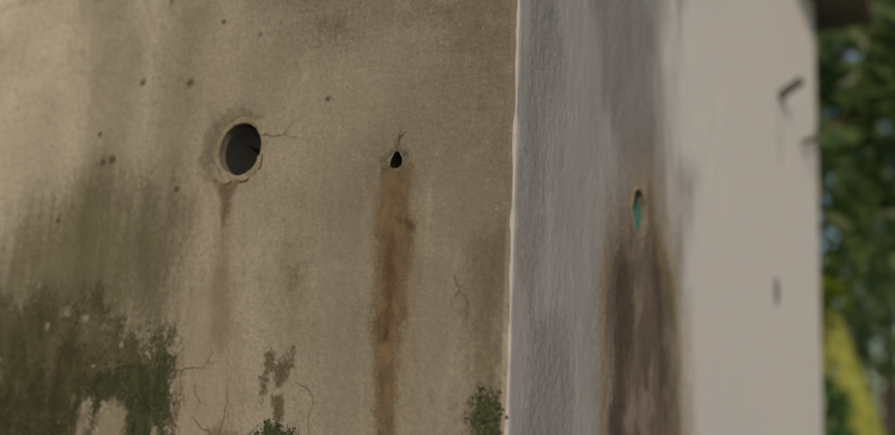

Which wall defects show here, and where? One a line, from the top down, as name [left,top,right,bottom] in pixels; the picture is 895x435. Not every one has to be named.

mould [260,346,296,395]
rust [371,164,414,435]
damp [602,155,691,435]